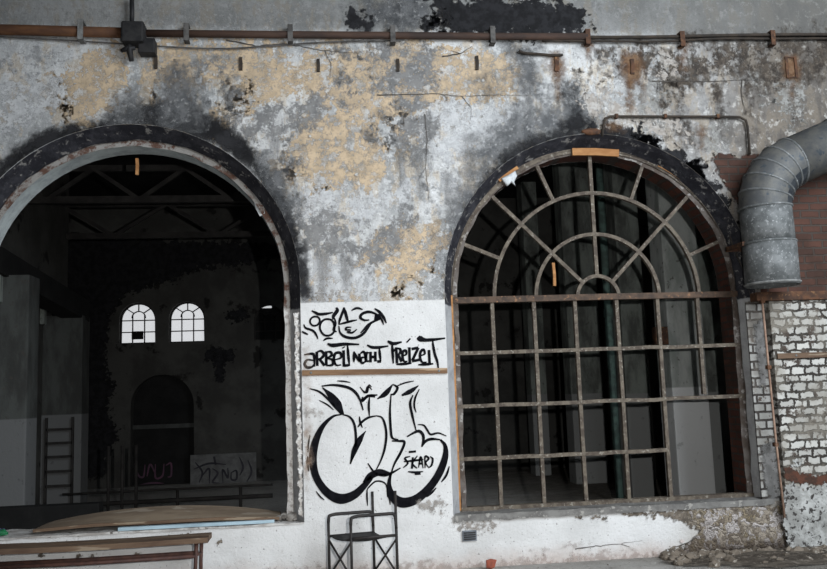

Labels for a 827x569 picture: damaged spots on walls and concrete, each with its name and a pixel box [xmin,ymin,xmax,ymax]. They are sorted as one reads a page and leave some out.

damp [108,91,141,125]
rust [622,53,644,106]
damp [596,28,827,119]
peeling [0,37,548,303]
spalling [623,440,827,552]